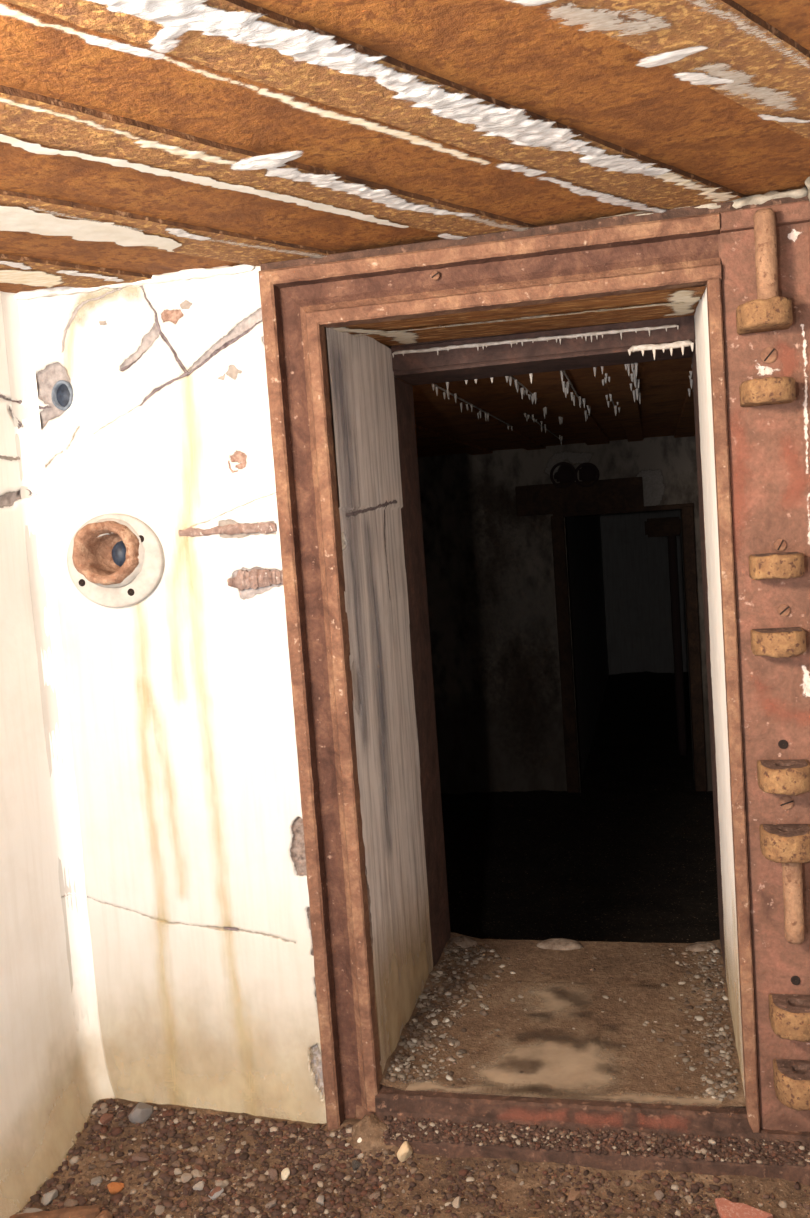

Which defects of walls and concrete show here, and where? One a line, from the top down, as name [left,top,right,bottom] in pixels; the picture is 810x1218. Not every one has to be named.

corrosion [161,309,184,324]
spalling [36,362,70,429]
crack [30,286,262,496]
corrosion [228,451,247,473]
spalling [219,519,276,538]
spalling [232,567,283,600]
spalling [290,817,307,876]
crack [99,901,296,943]
spalling [310,1044,324,1096]